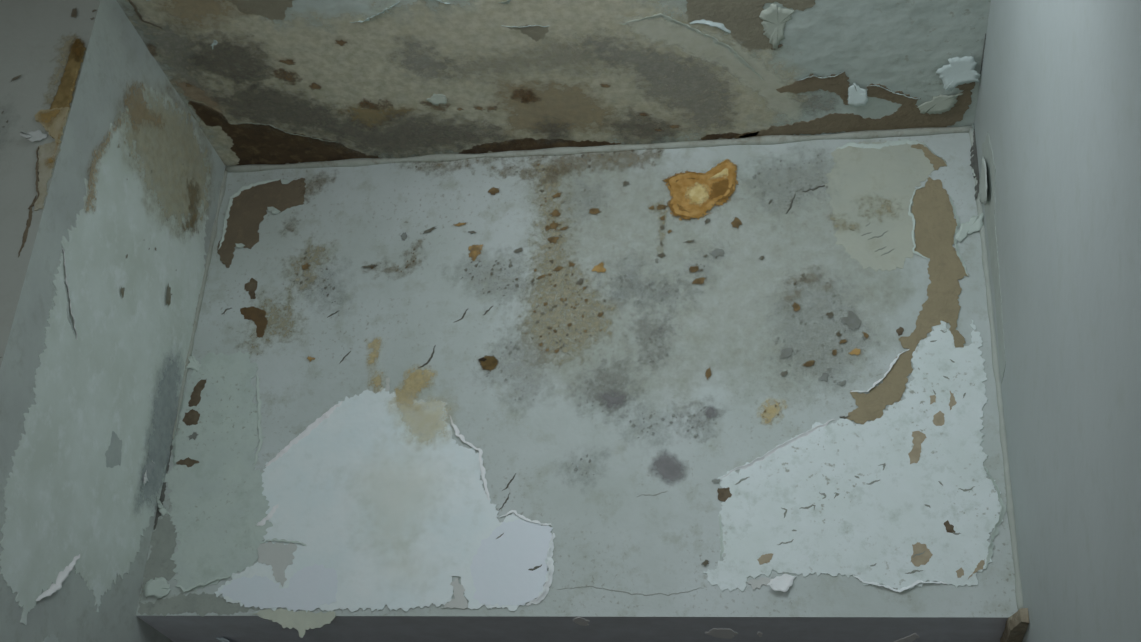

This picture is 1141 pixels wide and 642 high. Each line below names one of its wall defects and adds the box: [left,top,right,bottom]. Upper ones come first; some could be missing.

peeling [227,0,293,20]
peeling [686,0,815,51]
spalling [18,38,86,257]
water stain [124,0,805,365]
peeling [0,82,555,638]
water stain [630,406,717,438]
water stain [775,273,869,386]
peeling [700,56,1006,593]